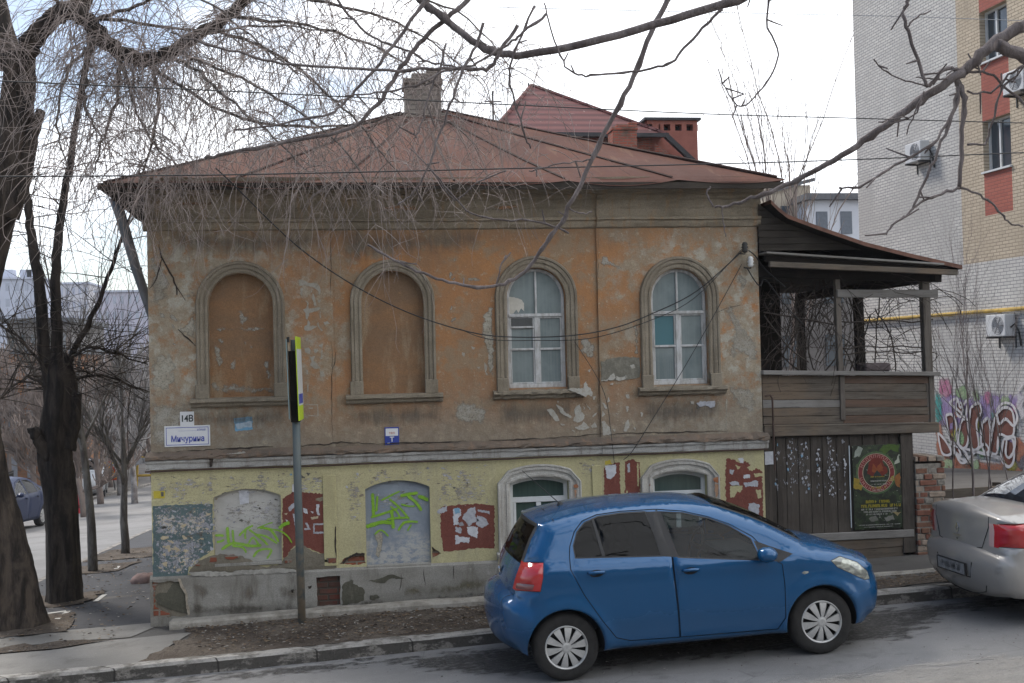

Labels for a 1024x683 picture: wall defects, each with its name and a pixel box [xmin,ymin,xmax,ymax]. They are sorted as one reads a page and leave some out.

peeling [462,308,495,375]
flaking render [547,326,643,436]
flaking render [690,401,715,409]
peeling [725,458,764,516]
peeling [152,504,217,577]
flaking render [340,552,365,565]